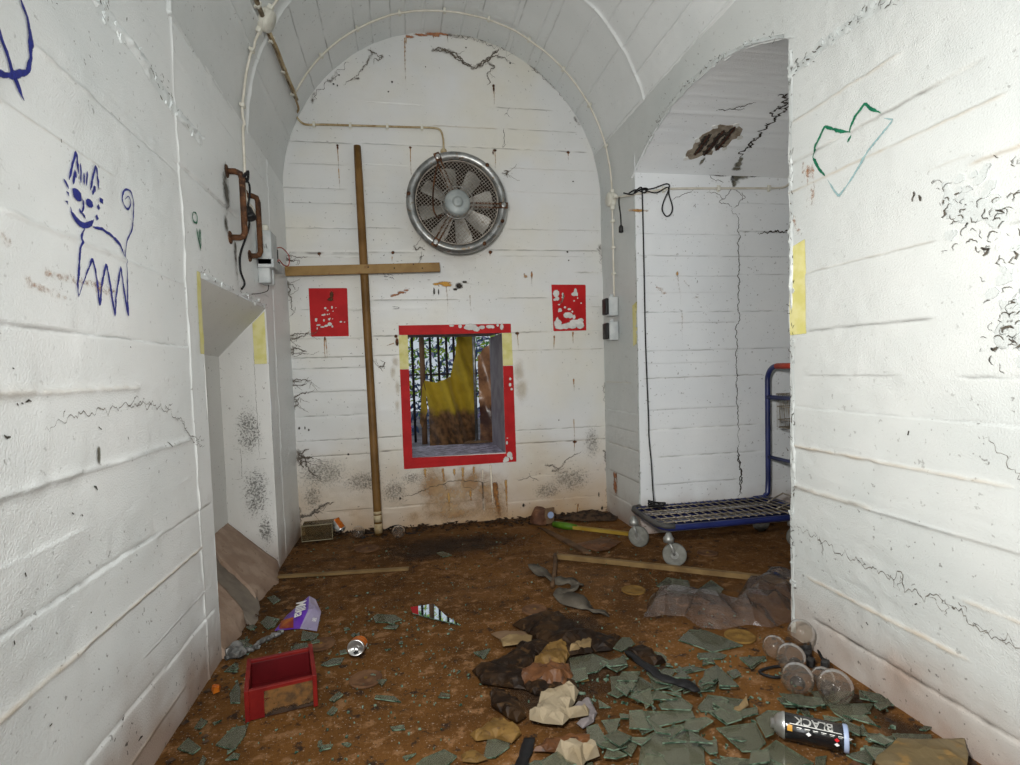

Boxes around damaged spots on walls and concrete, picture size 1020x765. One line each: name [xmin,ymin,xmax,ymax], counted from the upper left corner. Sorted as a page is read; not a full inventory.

spalling [683,123,743,164]
crack [718,94,789,157]
peeling [931,155,1020,372]
crack [673,176,788,495]
spalling [786,0,899,633]
crack [45,396,203,447]
mould [238,413,260,452]
mould [245,471,273,543]
damp [424,465,507,519]
crack [794,526,1017,651]